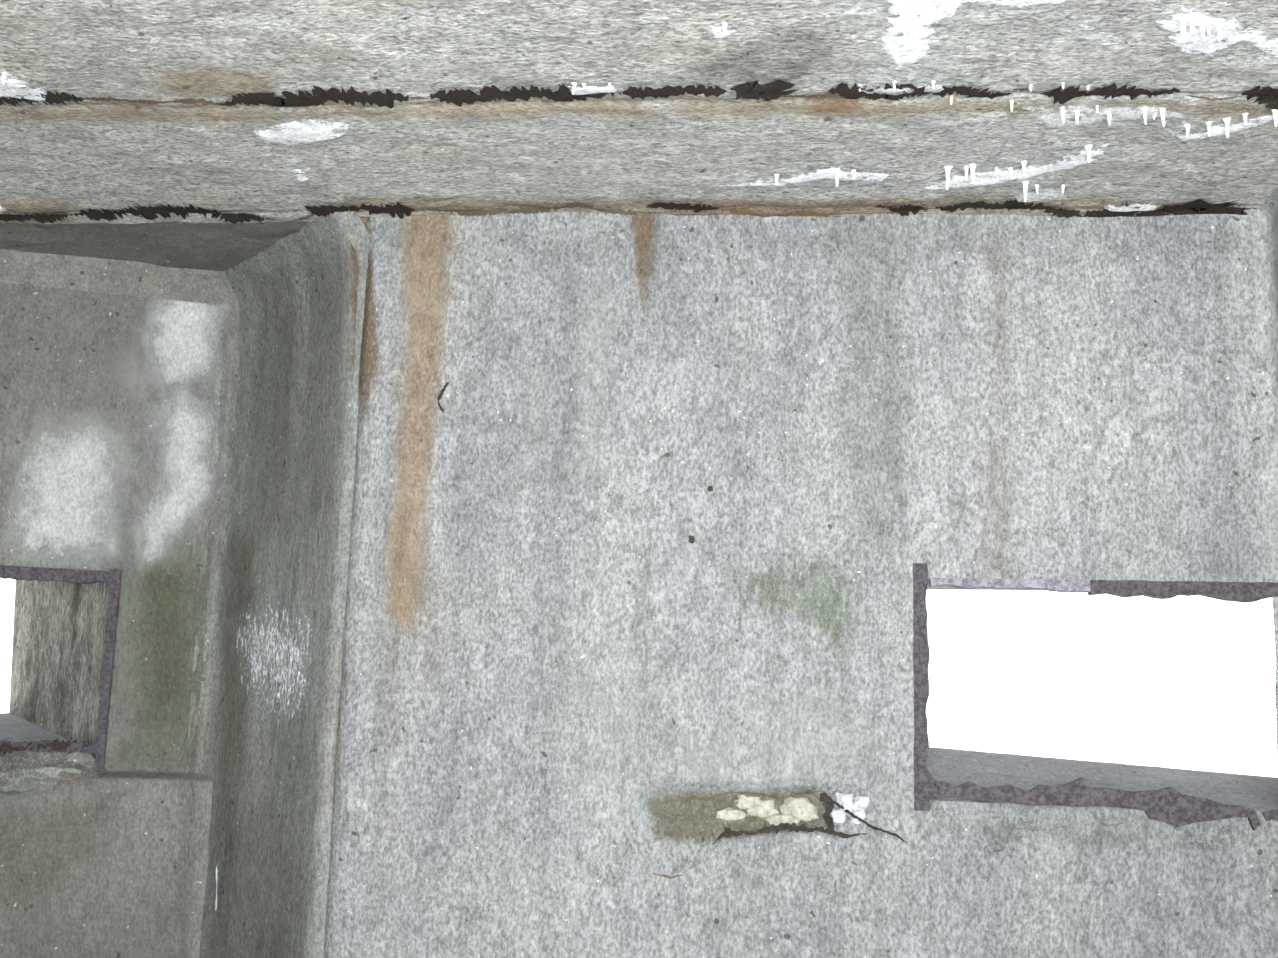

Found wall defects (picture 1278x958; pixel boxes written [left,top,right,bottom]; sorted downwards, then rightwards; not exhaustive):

efflorescence [845,0,1074,105]
efflorescence [1156,7,1278,59]
efflorescence [0,70,47,102]
efflorescence [1009,100,1278,142]
efflorescence [713,167,890,187]
efflorescence [924,143,1108,202]
efflorescence [1106,204,1158,212]
rust [632,212,654,304]
water stain [143,300,214,561]
water stain [14,426,117,555]
efflorescence [237,604,312,724]
spalling [652,791,907,845]